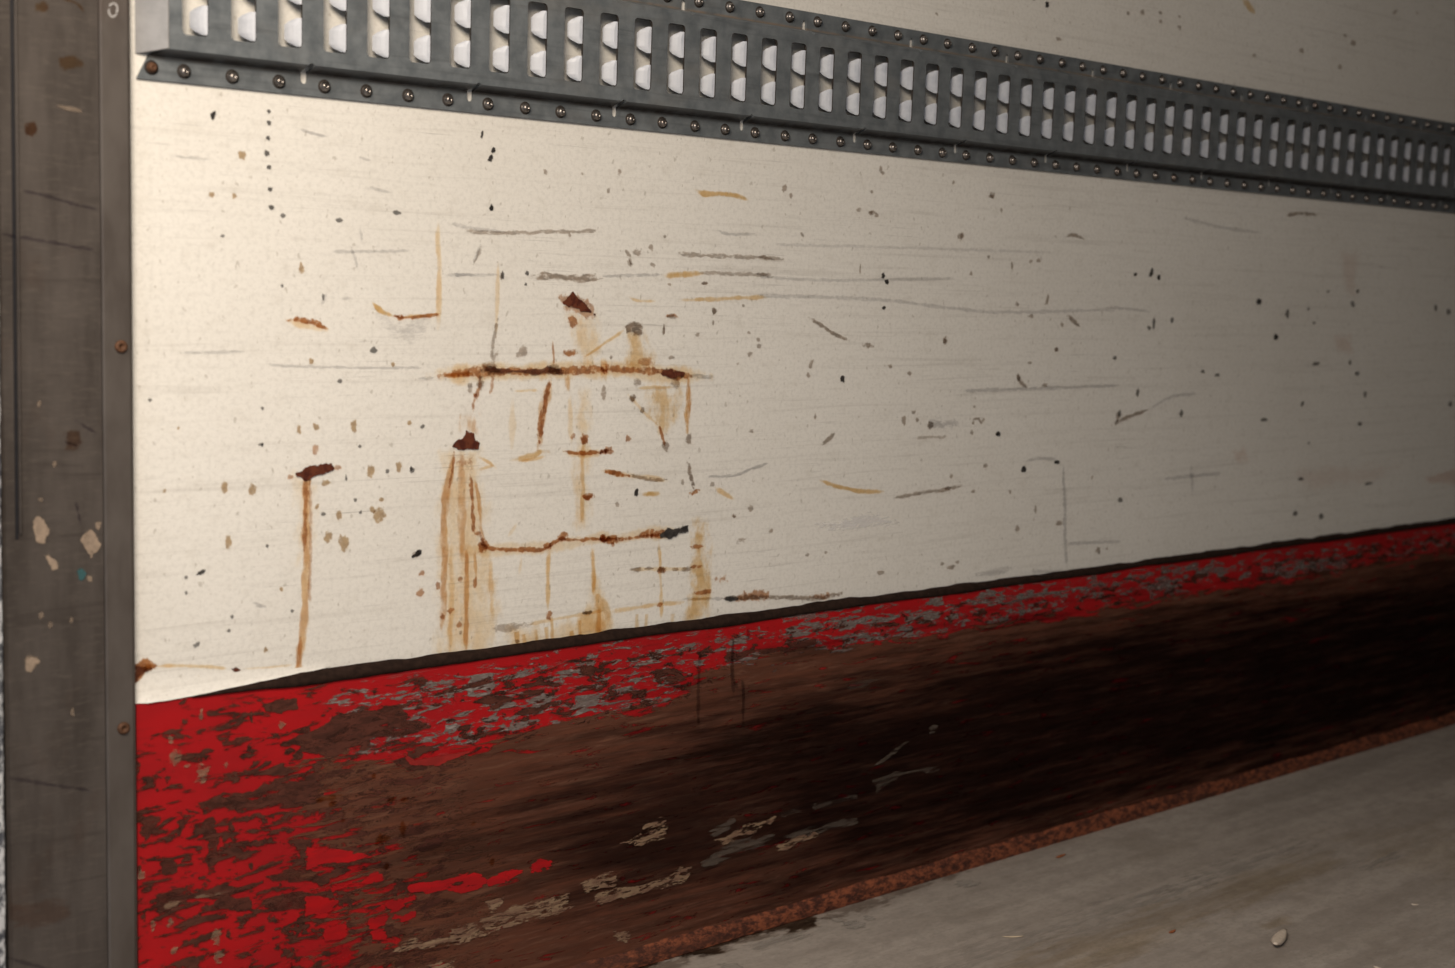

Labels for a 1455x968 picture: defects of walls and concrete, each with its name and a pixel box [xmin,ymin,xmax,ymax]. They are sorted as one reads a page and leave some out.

corrosion [295,463,334,481]
corrosion [452,430,480,450]
corrosion [458,366,685,443]
corrosion [471,479,665,552]
peeling [135,545,1455,968]